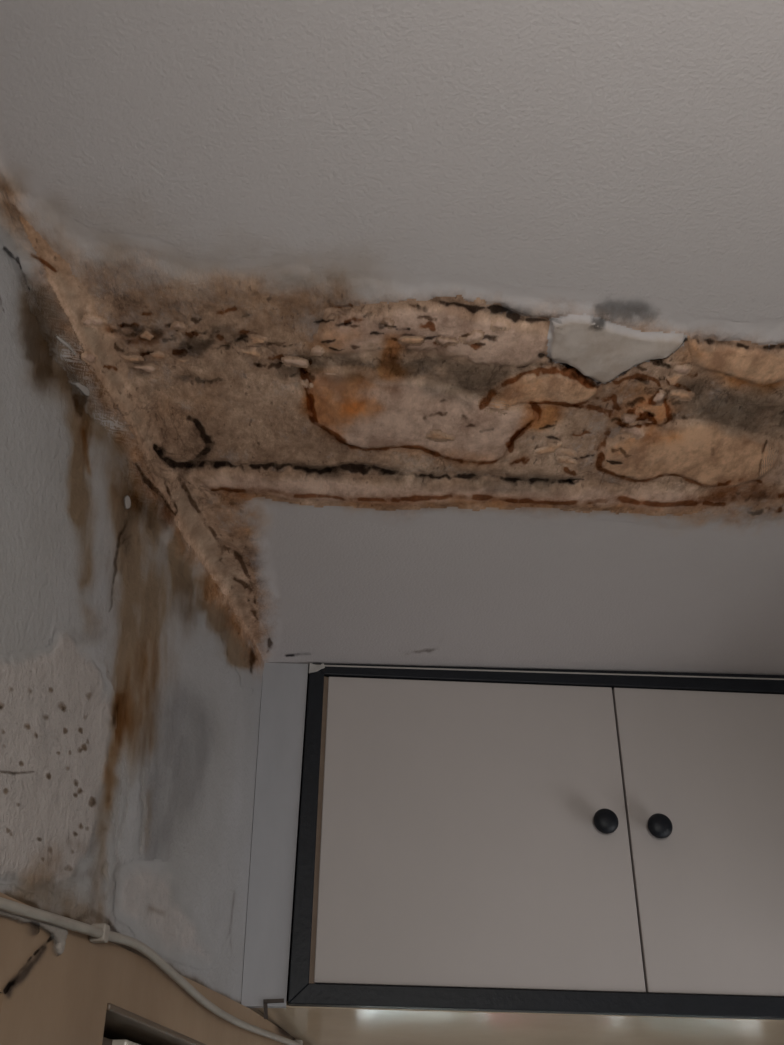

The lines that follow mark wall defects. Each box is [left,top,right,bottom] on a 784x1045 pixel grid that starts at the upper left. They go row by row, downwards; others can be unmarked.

spalling [0,147,784,694]